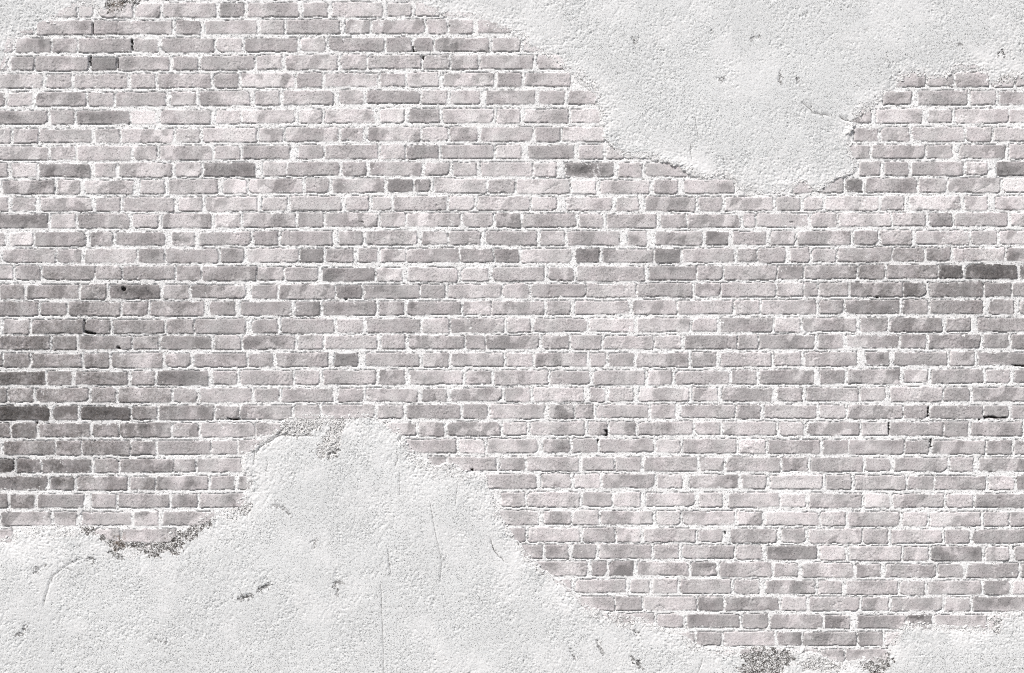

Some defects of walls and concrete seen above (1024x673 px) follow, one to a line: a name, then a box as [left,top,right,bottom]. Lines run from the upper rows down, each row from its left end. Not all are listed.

peeling [0,0,141,74]
peeling [395,0,1024,195]
peeling [0,412,1024,673]